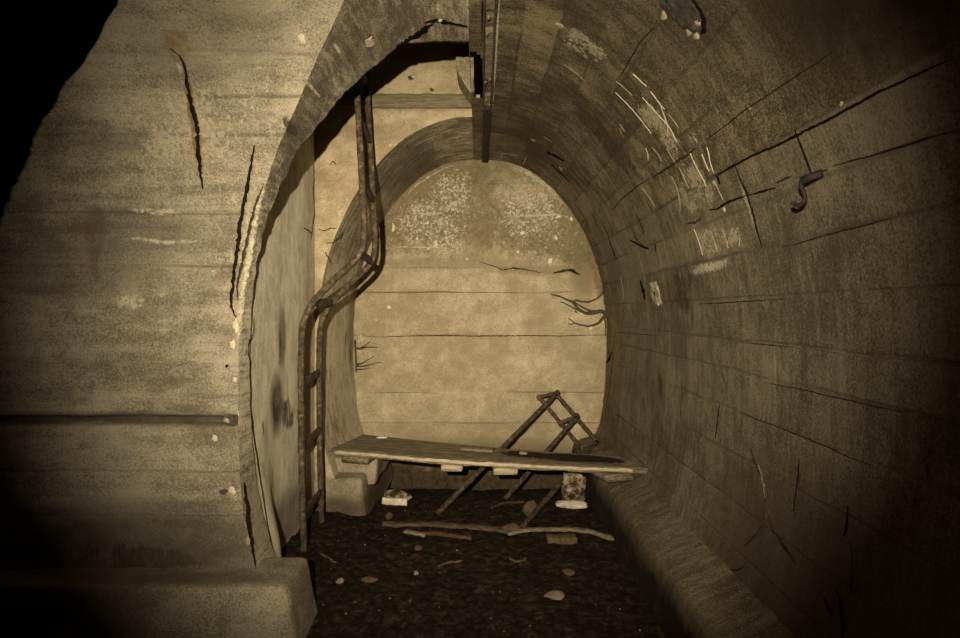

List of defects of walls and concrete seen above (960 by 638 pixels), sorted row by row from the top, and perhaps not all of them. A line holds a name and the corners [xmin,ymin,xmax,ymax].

spalling [658,0,707,40]
crack [617,27,654,81]
crack [170,48,211,189]
crack [576,51,955,405]
spalling [230,189,264,349]
crack [460,262,581,293]
spalling [640,280,663,306]
crack [227,145,272,568]
crack [367,332,585,340]
crack [765,382,902,412]
crack [715,360,875,512]